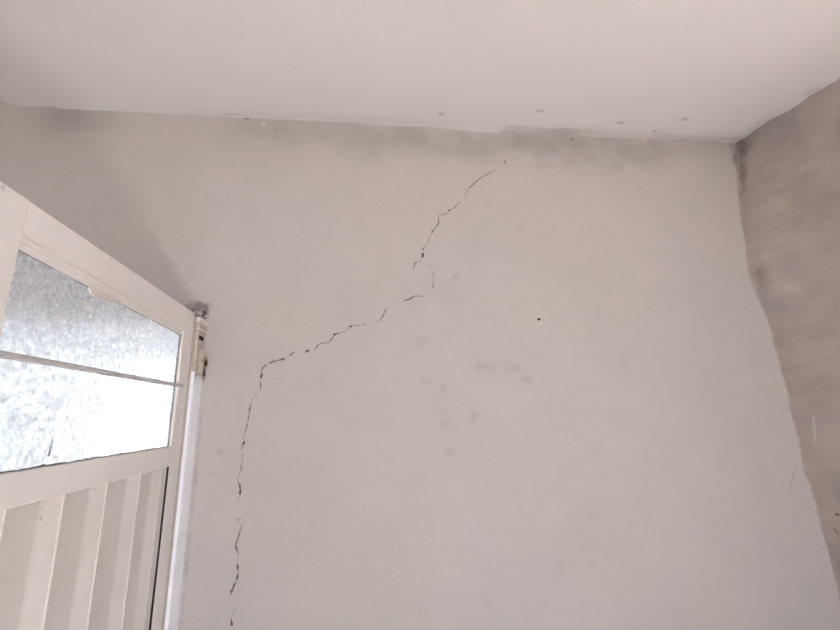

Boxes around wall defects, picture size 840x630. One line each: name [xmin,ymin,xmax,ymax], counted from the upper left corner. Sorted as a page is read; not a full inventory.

crack [237,151,524,499]
crack [230,519,243,626]